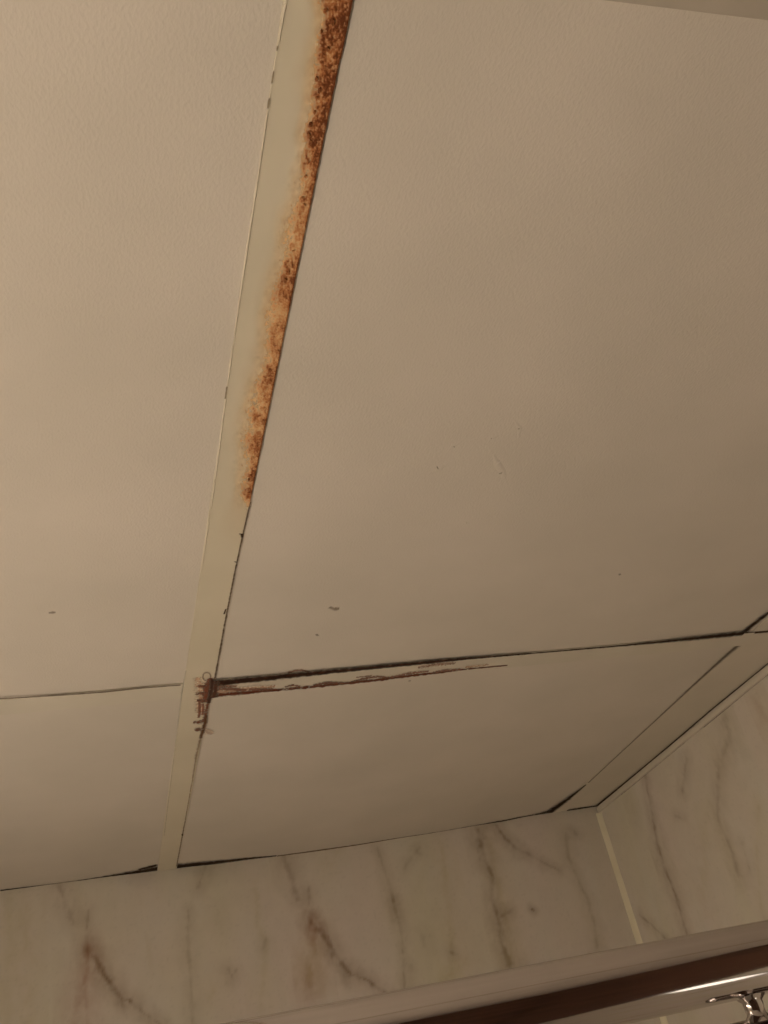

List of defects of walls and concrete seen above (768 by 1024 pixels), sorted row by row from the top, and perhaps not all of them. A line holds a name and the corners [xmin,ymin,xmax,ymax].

corrosion [240,0,353,506]
corrosion [193,653,531,739]